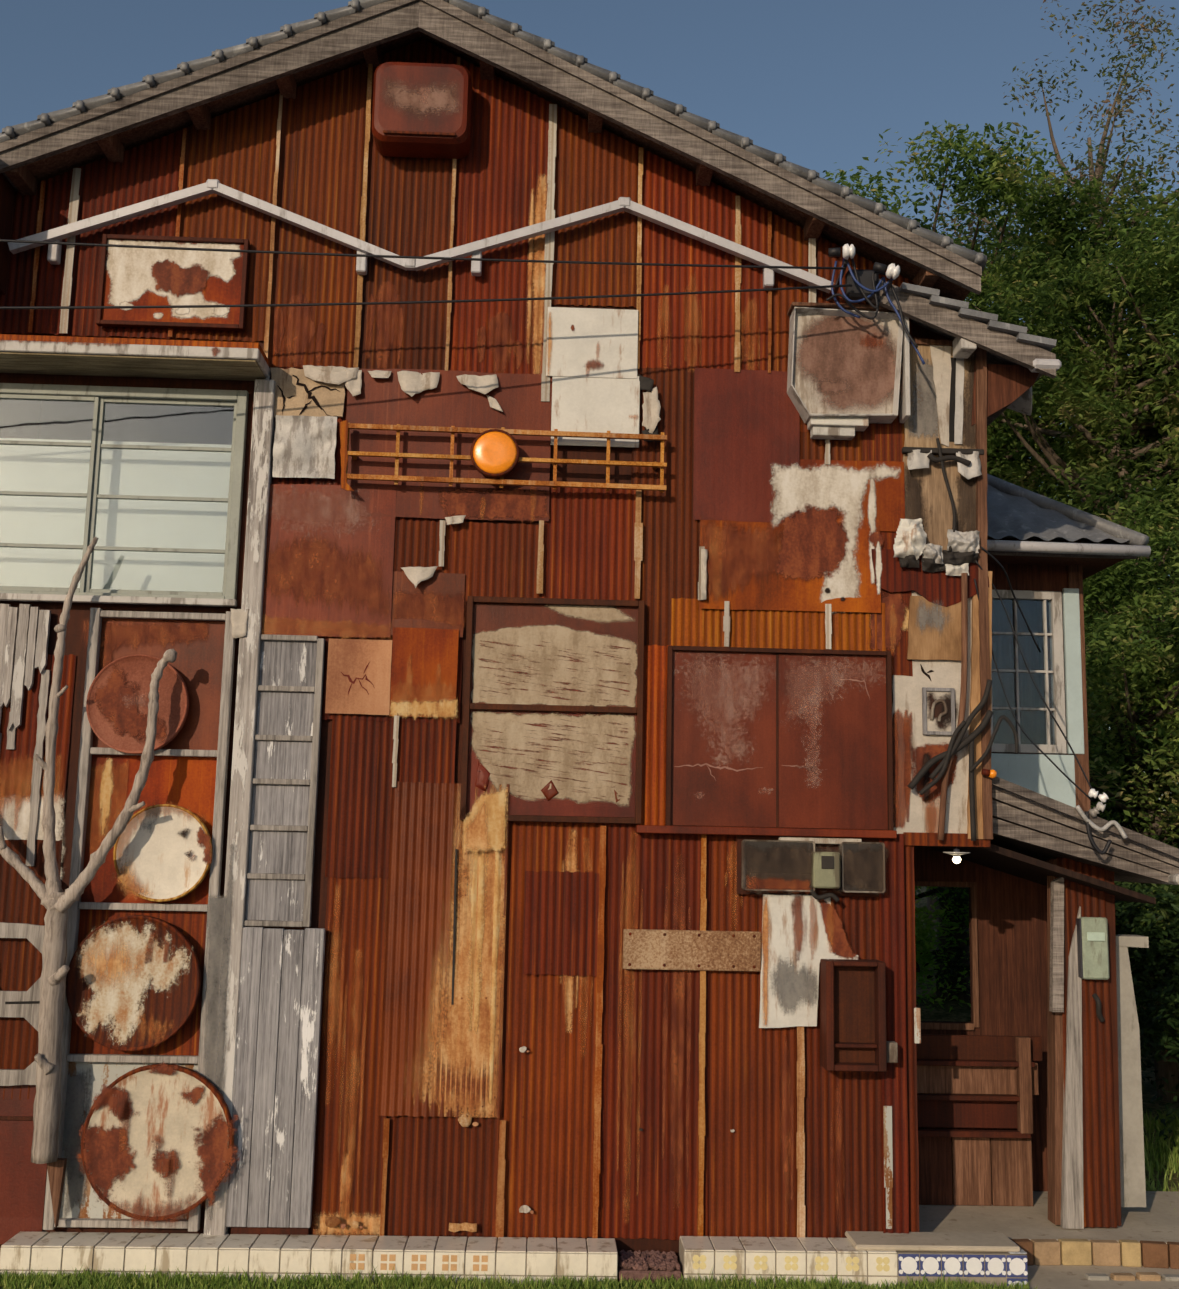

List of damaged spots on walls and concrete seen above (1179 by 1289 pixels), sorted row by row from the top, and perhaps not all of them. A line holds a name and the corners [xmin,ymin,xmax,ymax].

peeling [106,239,240,319]
crack [277,375,340,416]
peeling [303,365,440,397]
peeling [456,374,503,412]
peeling [771,338,993,847]
crack [341,662,375,694]
peeling [462,605,638,853]
corrosion [414,794,507,1118]
corrosion [792,895,803,961]
corrosion [819,899,856,959]
corrosion [662,970,691,1207]
corrosion [76,1084,239,1226]